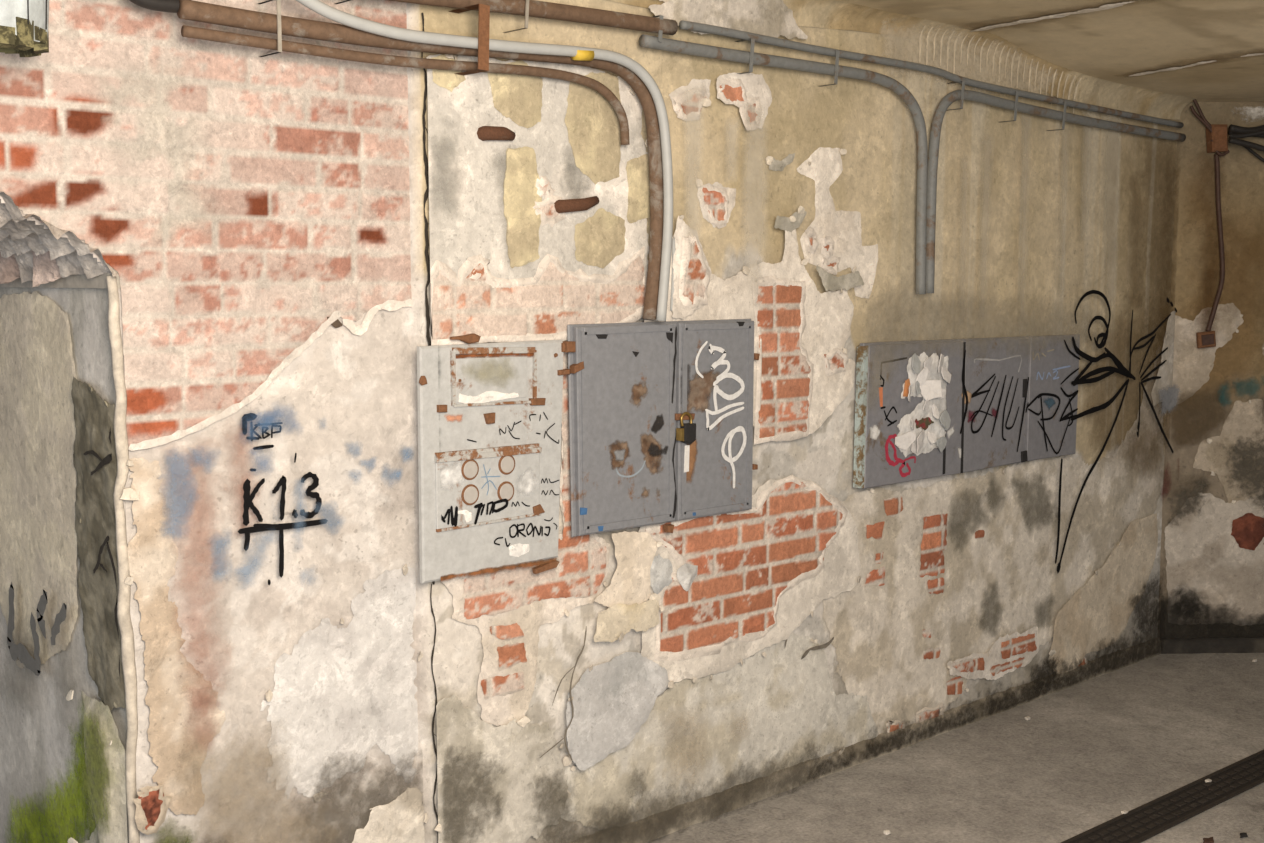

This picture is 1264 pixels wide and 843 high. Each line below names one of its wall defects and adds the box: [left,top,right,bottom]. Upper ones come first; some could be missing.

crack [421,12,431,346]
flaking render [0,0,413,835]
flaking render [260,54,1264,843]
water stain [951,483,999,546]
water stain [1015,480,1053,527]
water stain [305,763,419,843]
crack [430,581,438,843]
water stain [444,758,501,843]
water stain [537,579,1264,843]